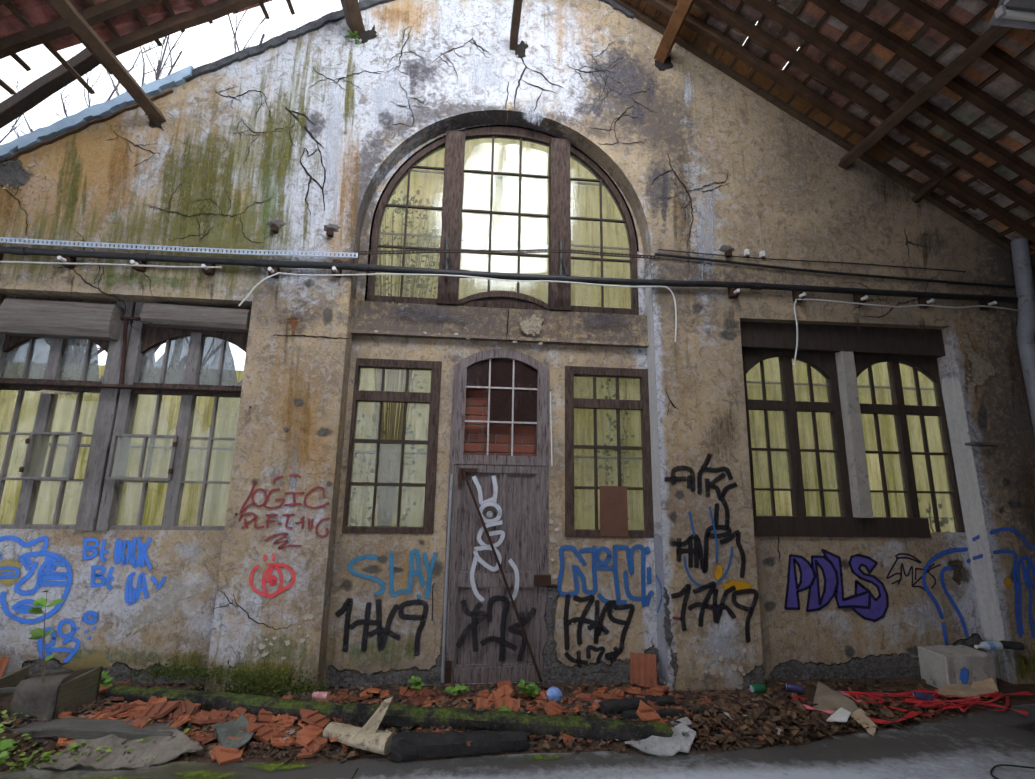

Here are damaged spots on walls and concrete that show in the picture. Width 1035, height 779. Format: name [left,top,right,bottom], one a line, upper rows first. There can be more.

crack [310,26,491,127]
crack [505,41,657,145]
water stain [577,47,655,124]
spalling [0,160,39,190]
crack [109,127,157,167]
water stain [162,140,241,238]
crack [216,86,326,215]
water stain [263,118,286,235]
water stain [297,65,359,228]
crack [651,155,729,242]
crack [53,183,274,331]
crack [213,590,291,631]